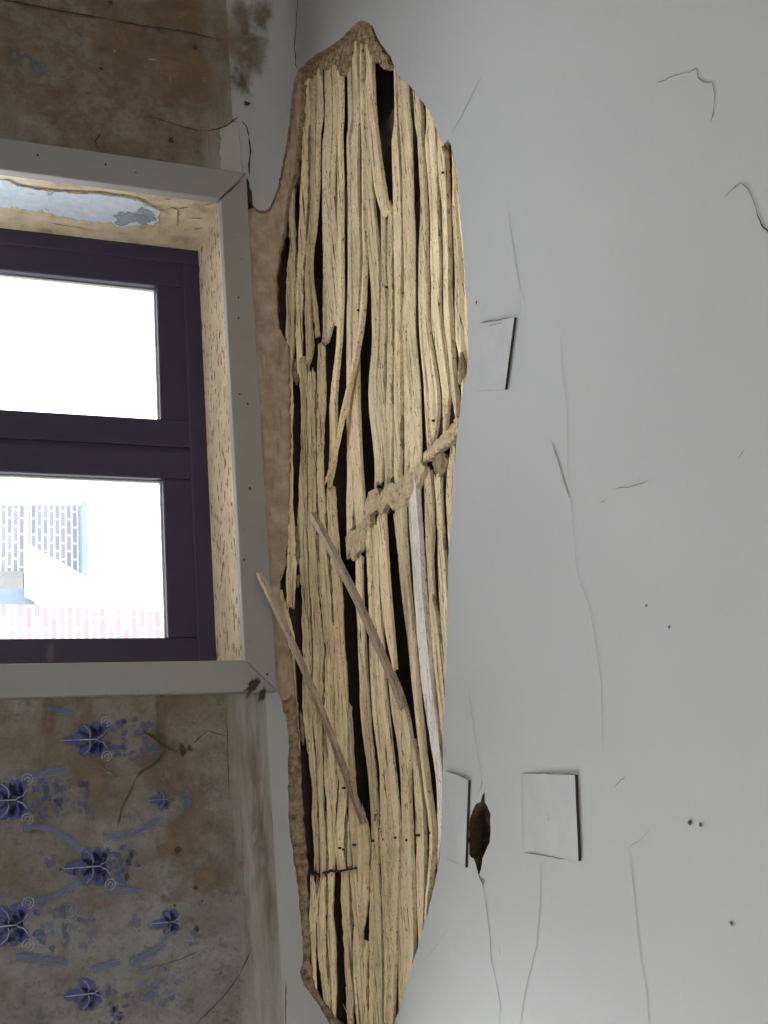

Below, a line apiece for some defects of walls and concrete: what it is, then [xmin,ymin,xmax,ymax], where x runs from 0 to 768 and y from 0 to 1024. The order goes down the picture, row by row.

crack [656,68,715,119]
crack [147,116,251,200]
peeling [0,179,180,230]
crack [726,182,768,232]
flaking render [244,23,468,1024]
crack [117,712,229,828]